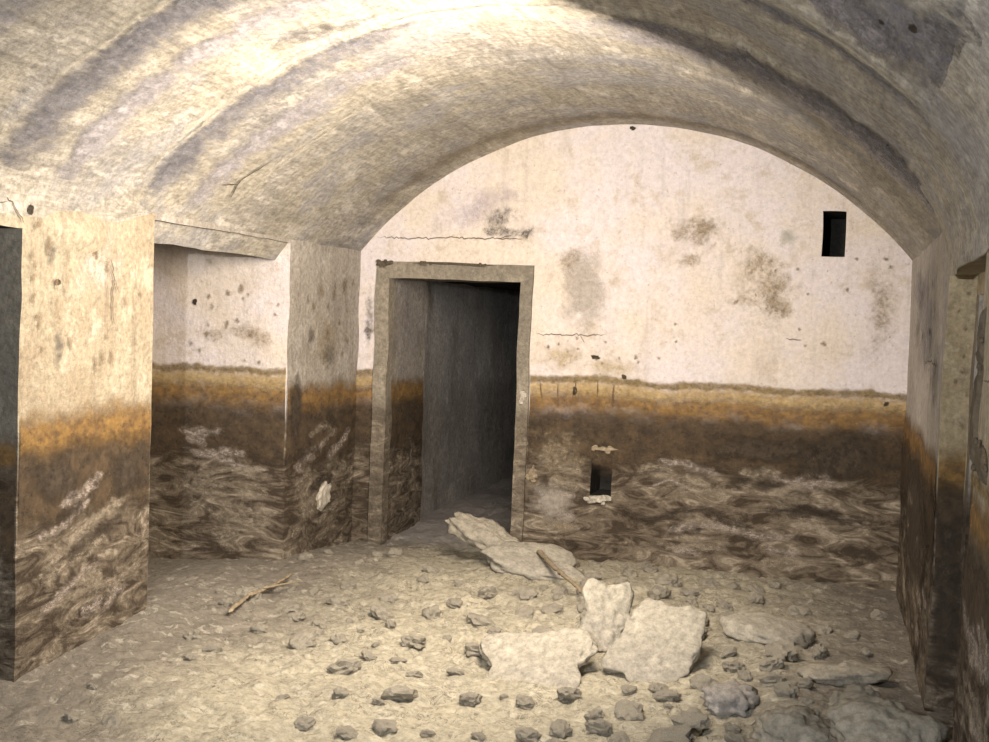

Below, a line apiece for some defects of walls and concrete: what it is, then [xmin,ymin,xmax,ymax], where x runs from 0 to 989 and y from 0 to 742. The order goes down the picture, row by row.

water stain [390,381,424,450]